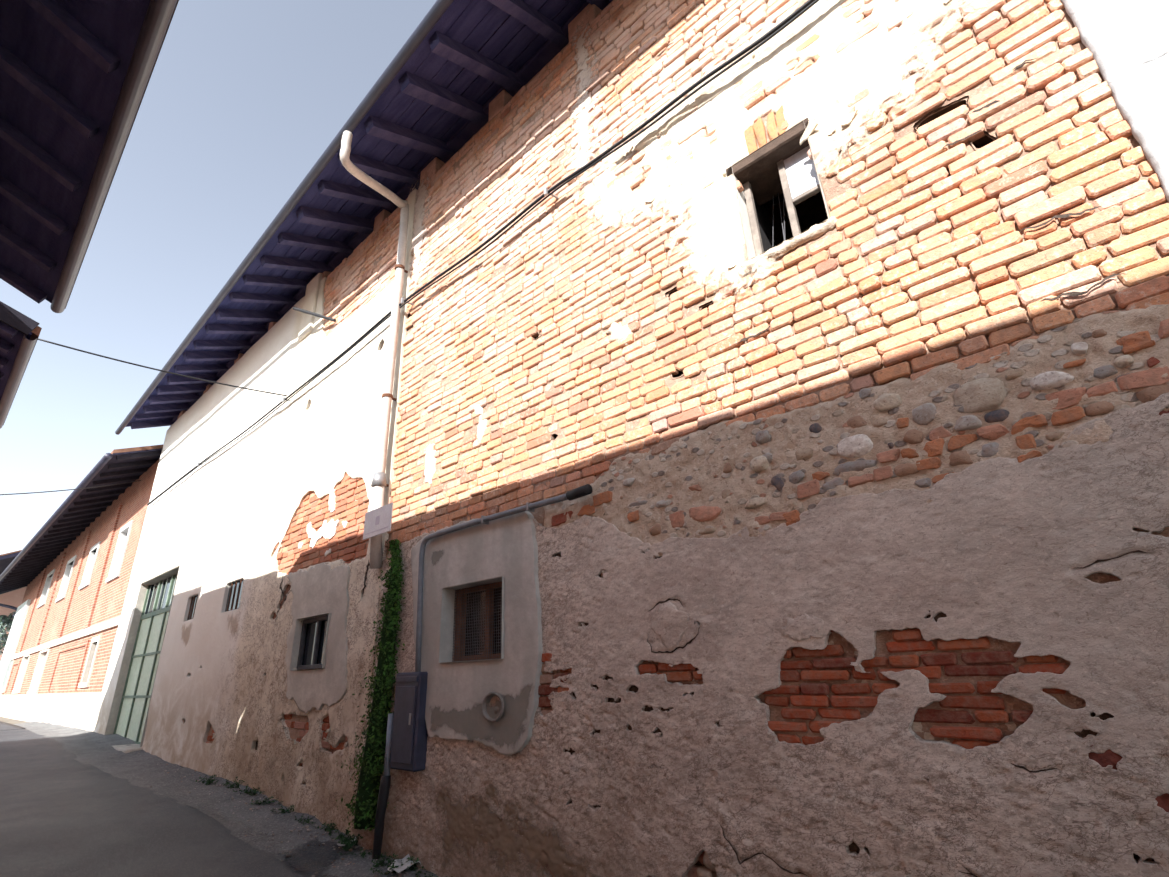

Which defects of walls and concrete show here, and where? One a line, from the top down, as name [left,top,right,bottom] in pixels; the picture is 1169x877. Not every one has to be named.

peeling [576,0,988,311]
spalling [968,131,997,151]
flaking render [543,304,1169,559]
flaking render [298,489,348,557]
spalling [538,653,577,715]
spalling [608,663,703,703]
spalling [762,611,1069,749]
spalling [276,713,350,754]
spalling [688,852,717,877]